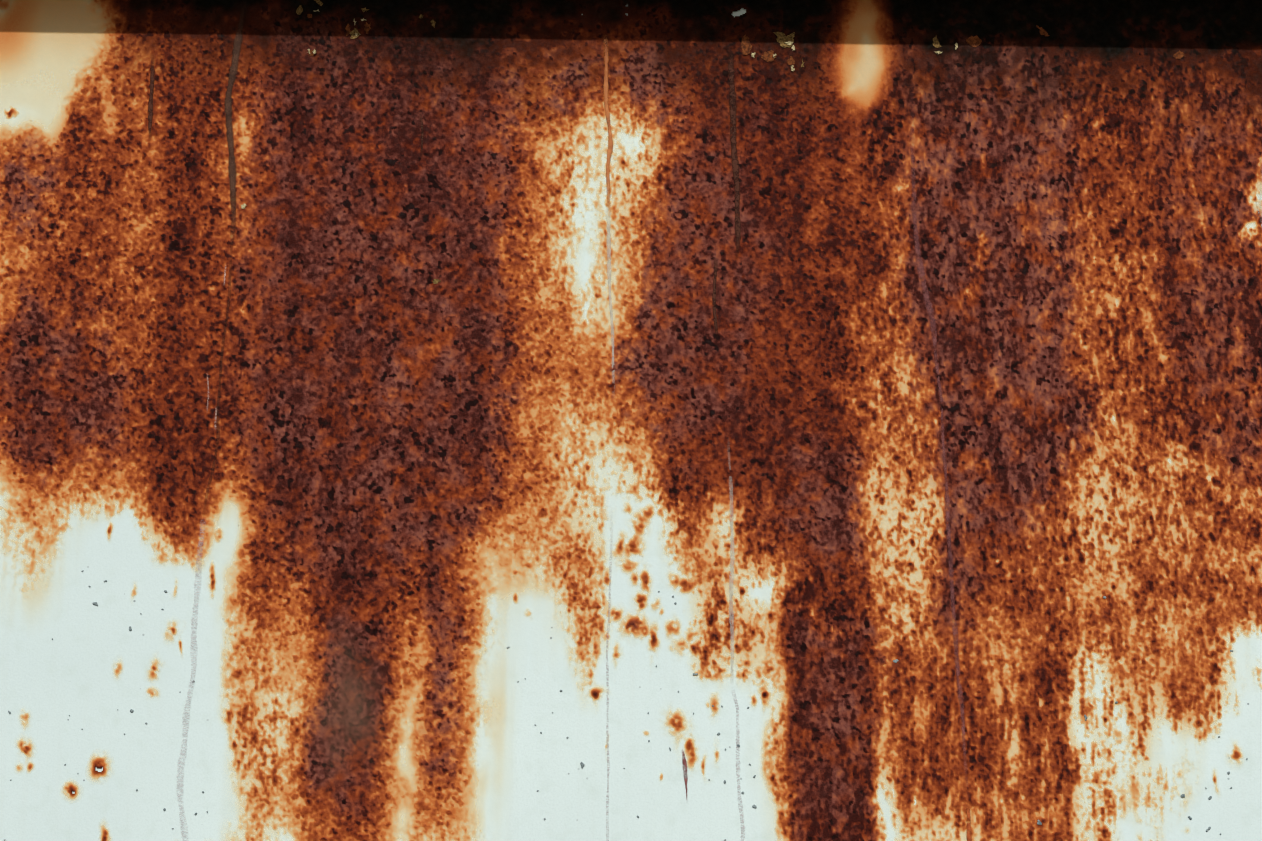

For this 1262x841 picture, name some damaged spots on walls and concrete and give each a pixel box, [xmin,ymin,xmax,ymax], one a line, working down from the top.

corrosion [0,0,677,841]
corrosion [613,0,1262,841]